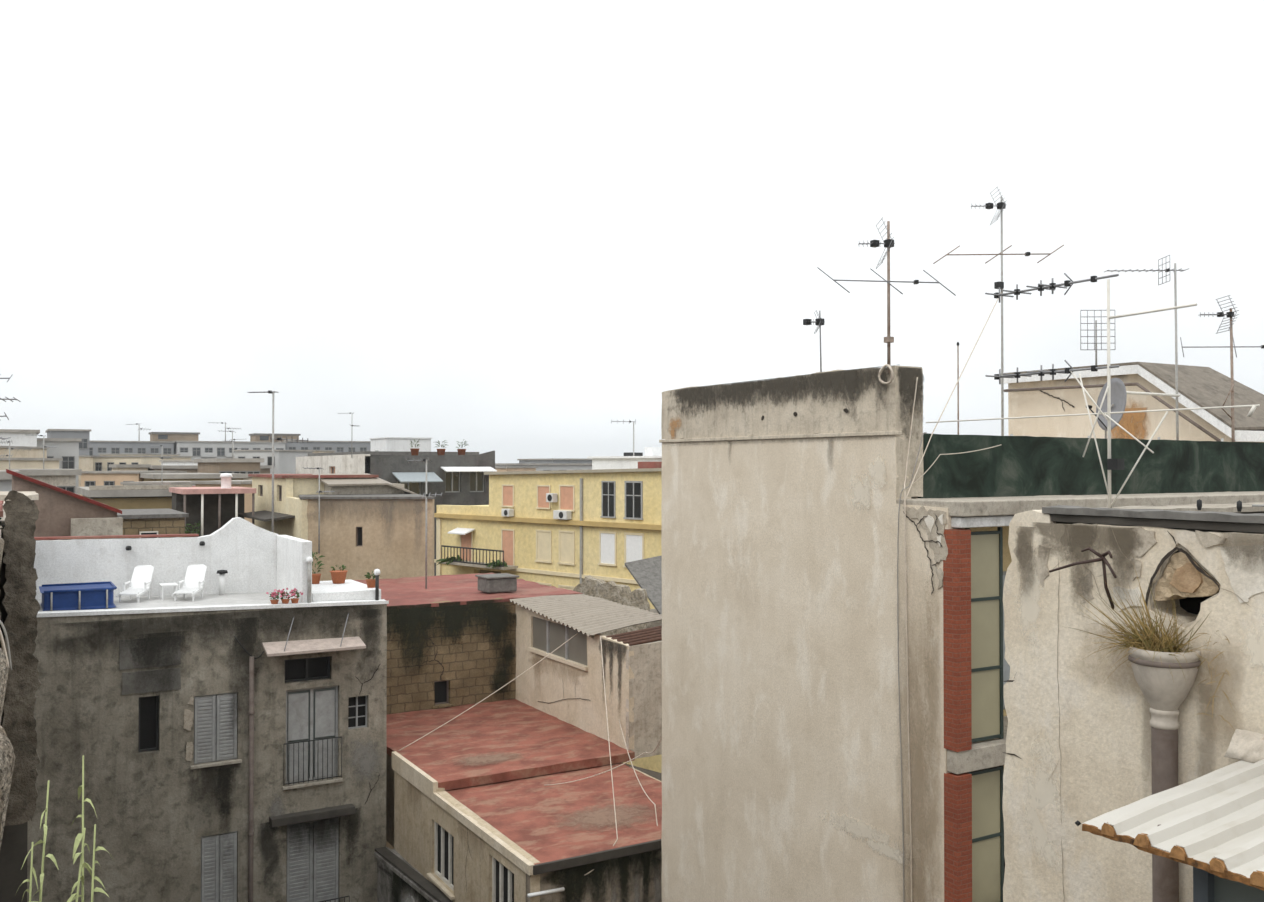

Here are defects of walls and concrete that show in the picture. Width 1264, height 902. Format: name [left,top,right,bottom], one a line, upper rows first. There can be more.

damp [668,364,924,438]
peeling [903,506,948,589]
peeling [1014,531,1068,587]
spalling [1113,527,1264,628]
damp [62,599,517,707]
crack [1047,528,1135,893]